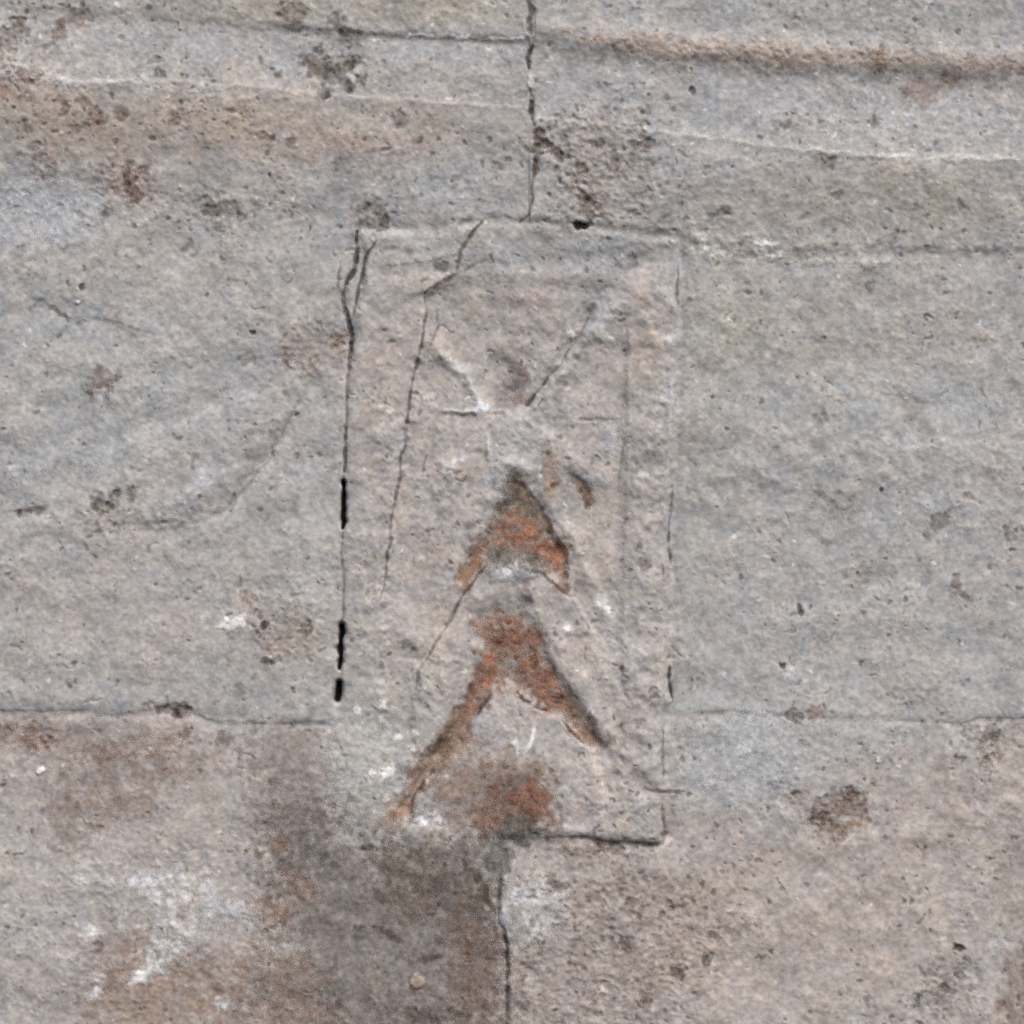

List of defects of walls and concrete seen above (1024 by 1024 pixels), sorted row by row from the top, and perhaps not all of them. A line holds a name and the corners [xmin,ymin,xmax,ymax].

crack [519,0,552,223]
crack [338,232,412,564]
crack [400,222,483,471]
crack [335,601,345,701]
crack [454,566,485,612]
rust [394,608,593,815]
rust [439,759,553,840]
rust [459,473,567,592]
rust [570,475,591,505]
leakage [289,848,496,1024]